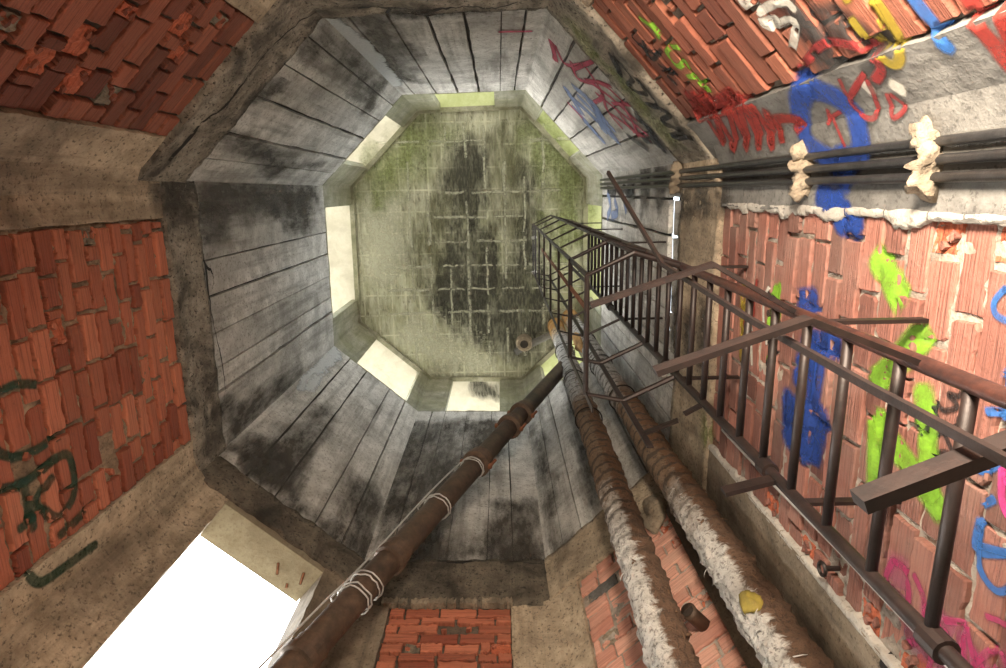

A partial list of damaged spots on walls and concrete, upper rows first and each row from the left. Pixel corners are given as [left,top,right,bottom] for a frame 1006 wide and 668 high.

spalling [16,23,97,95]
spalling [167,11,195,63]
leakage [362,123,567,399]
spalling [727,203,1006,255]
leakage [221,374,328,514]
leakage [319,419,496,560]
leakage [410,432,555,561]
crack [879,652,896,668]